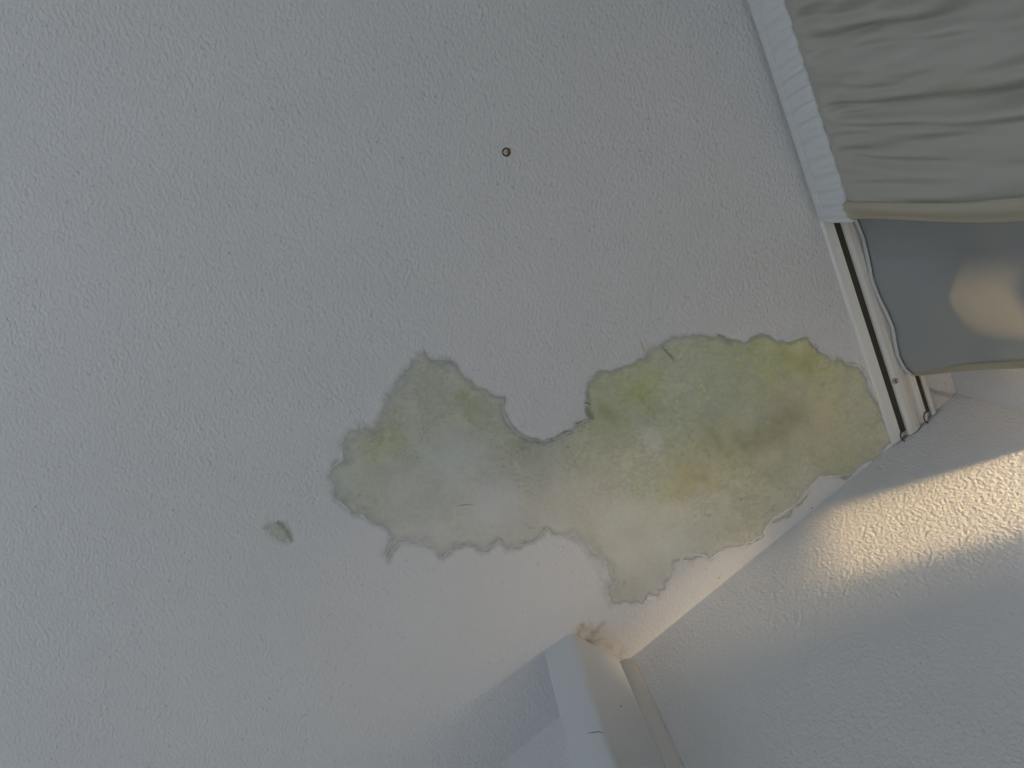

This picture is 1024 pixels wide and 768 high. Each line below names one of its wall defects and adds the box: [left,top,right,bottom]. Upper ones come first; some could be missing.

damp [586,337,879,498]